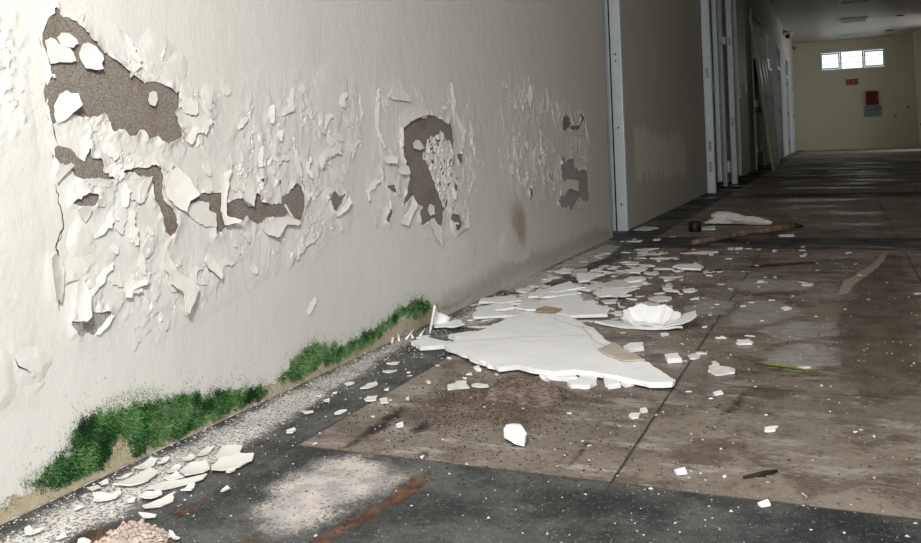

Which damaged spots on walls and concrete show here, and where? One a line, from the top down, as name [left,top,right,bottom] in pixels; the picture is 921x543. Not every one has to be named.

peeling [39,7,199,143]
peeling [562,112,584,135]
crack [55,184,64,256]
peeling [52,146,114,223]
peeling [124,165,304,314]
peeling [384,79,462,246]
peeling [549,157,589,214]
peeling [51,253,65,302]
peeling [72,278,114,337]
leakage [0,221,613,536]
corrosion [310,475,428,543]